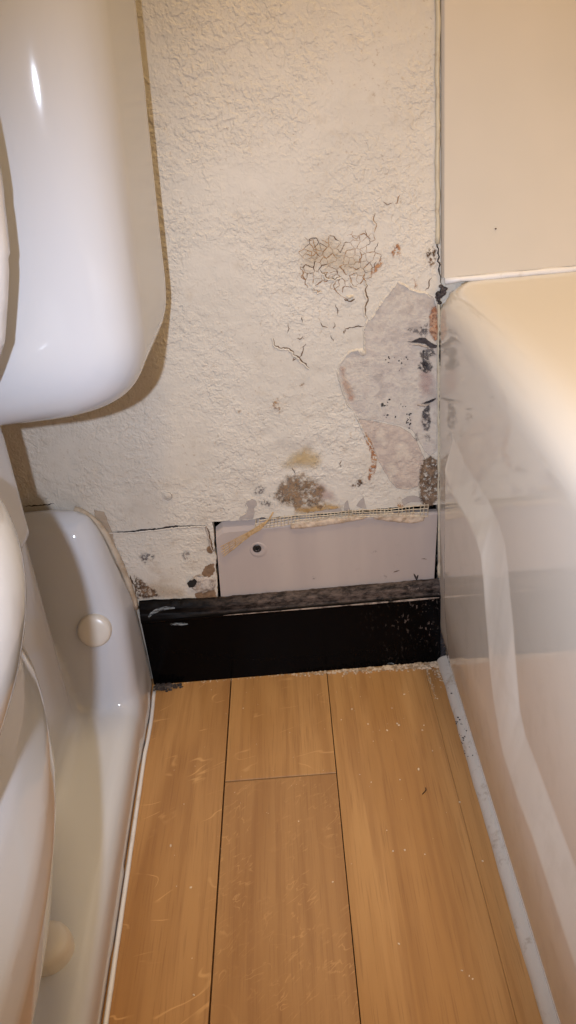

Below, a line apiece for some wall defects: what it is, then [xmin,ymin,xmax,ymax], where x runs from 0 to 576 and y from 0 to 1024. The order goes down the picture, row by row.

crack [271,195,400,370]
peeling [336,282,437,456]
water stain [255,453,338,513]
water stain [419,456,438,508]
spalling [94,510,115,545]
spalling [187,546,217,598]